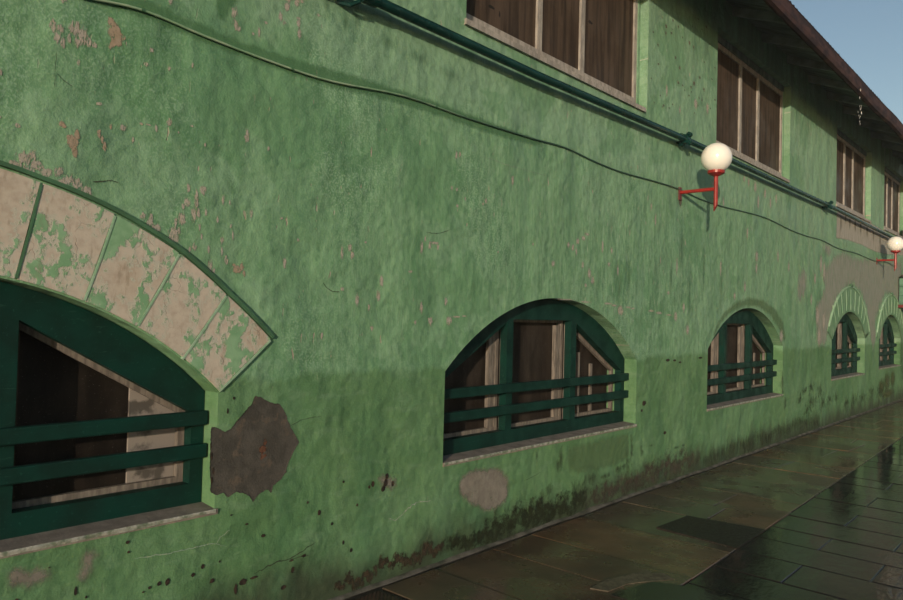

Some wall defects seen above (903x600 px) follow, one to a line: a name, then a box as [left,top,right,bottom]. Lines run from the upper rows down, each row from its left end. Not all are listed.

peeling [49,17,125,49]
peeling [9,150,91,195]
peeling [140,183,219,273]
flaking render [210,396,299,501]
flaking render [460,468,508,510]
damp [334,490,595,591]